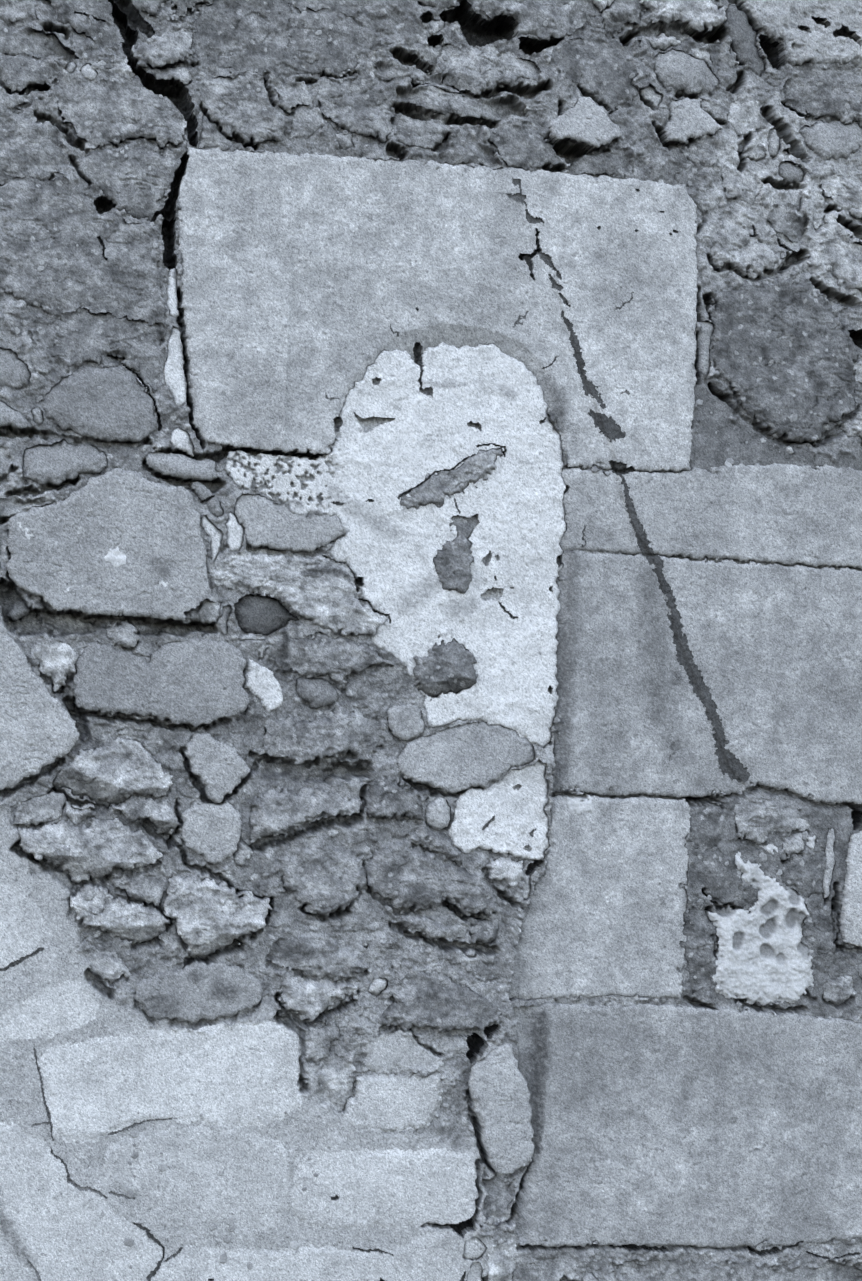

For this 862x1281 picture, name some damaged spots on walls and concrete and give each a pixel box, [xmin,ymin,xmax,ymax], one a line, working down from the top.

spalling [333,413,394,433]
crack [506,178,751,783]
spalling [480,551,514,601]
crack [498,601,518,619]
spalling [523,829,543,875]